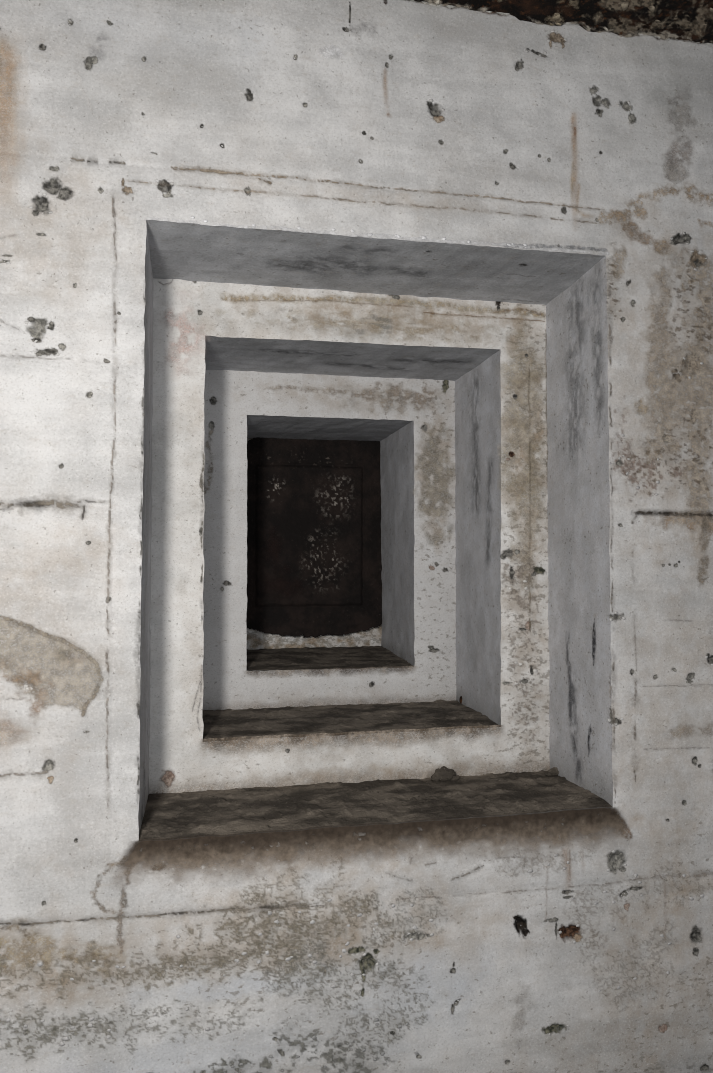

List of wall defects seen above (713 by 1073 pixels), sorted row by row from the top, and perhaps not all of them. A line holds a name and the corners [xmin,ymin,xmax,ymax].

water stain [599,143,713,253]
crack [606,324,614,447]
water stain [635,255,713,583]
crack [611,511,713,612]
water stain [0,616,103,717]
crack [609,663,637,741]
water stain [94,857,130,953]
spalling [513,915,530,936]